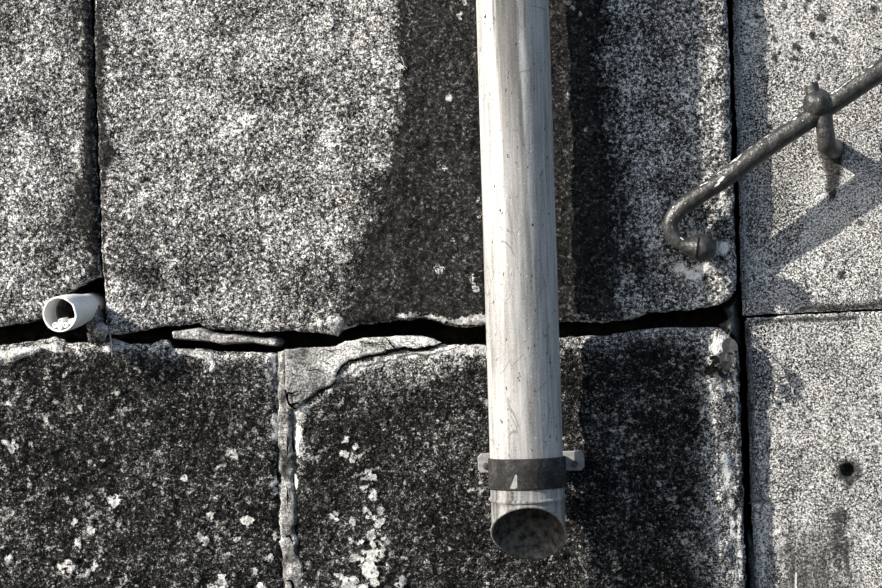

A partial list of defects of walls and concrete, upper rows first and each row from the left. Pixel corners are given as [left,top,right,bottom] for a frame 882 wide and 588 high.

water stain [340,0,486,326]
water stain [270,413,278,444]
water stain [293,424,305,458]
crack [284,338,444,456]
water stain [705,335,744,588]